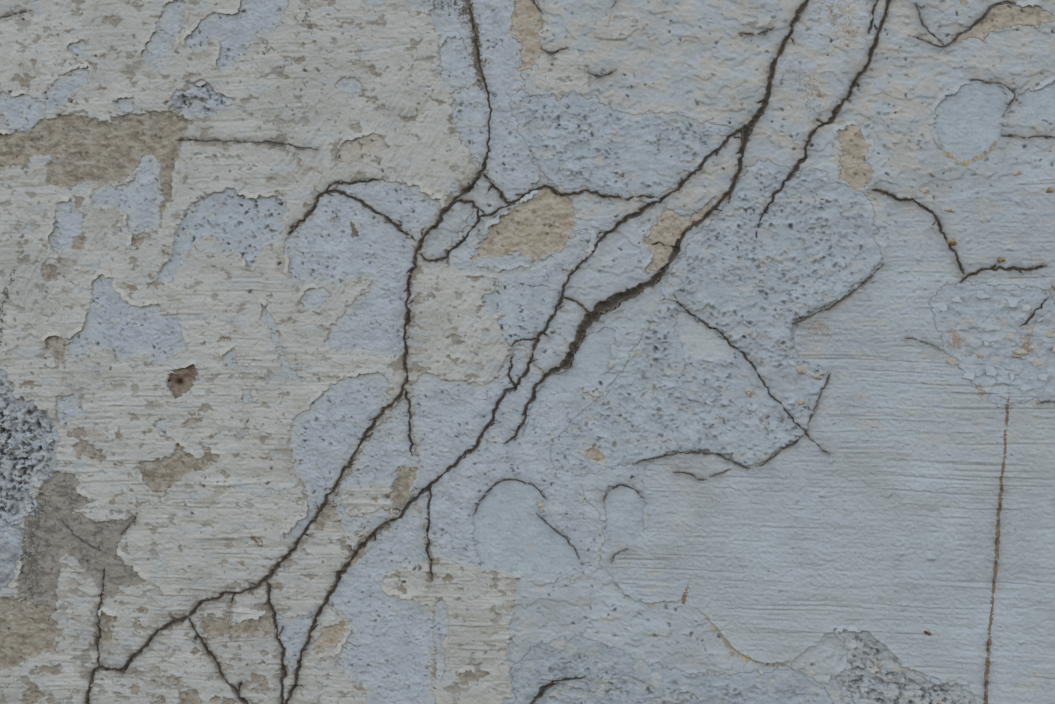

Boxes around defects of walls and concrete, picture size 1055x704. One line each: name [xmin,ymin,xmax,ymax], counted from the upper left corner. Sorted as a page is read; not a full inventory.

crack [913,1,1016,48]
flaking render [0,37,234,282]
crack [756,0,890,238]
peeling [40,270,198,399]
peeling [138,0,622,704]
crack [62,0,830,704]
crack [793,264,884,324]
crack [872,189,1046,283]
peeling [928,281,1055,409]
crack [1019,299,1047,327]
flaking render [0,369,151,670]
flaking render [510,625,976,704]